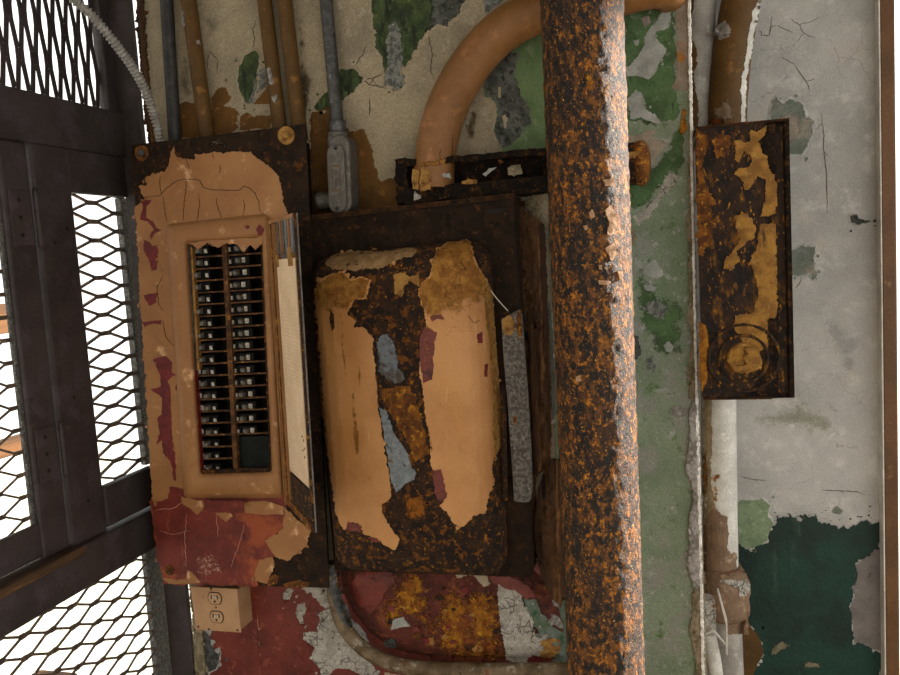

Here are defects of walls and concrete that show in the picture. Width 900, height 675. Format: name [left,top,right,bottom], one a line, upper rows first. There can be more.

peeling [209,47,277,135]
peeling [369,0,466,93]
peeling [481,35,546,152]
corrosion [585,70,611,97]
crack [757,17,819,38]
peeling [767,94,815,162]
crack [817,115,828,211]
peeling [583,0,707,675]
peeling [189,566,510,675]
peeling [719,495,881,675]